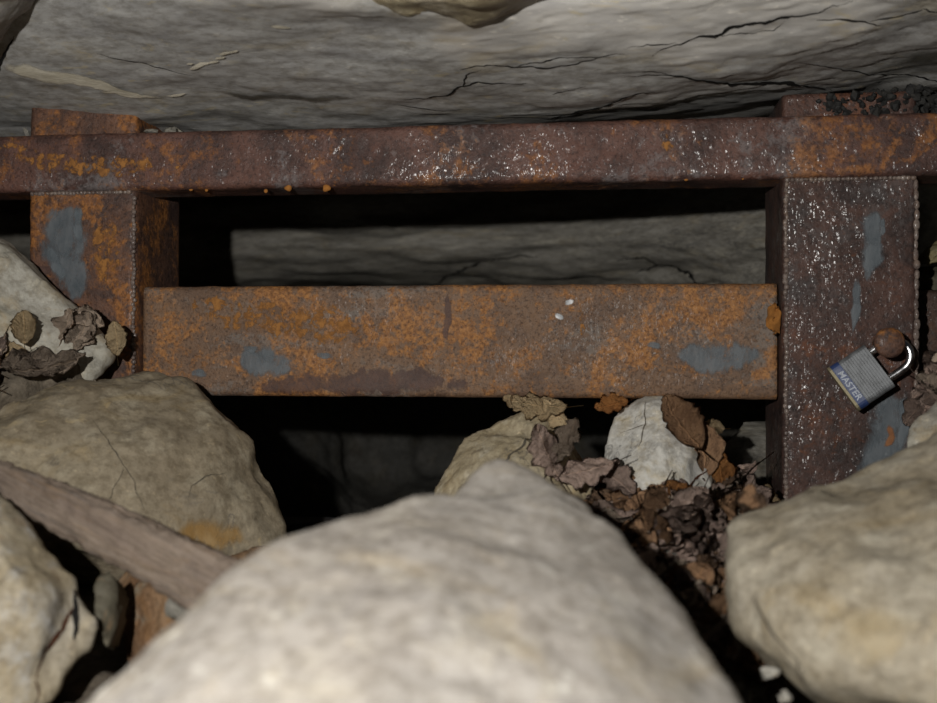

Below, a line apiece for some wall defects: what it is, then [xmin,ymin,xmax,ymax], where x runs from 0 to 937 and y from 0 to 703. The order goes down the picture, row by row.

corrosion [0,139,153,177]
corrosion [93,224,120,292]
corrosion [191,295,378,345]
corrosion [443,297,452,339]
corrosion [766,302,782,335]
corrosion [262,367,467,397]